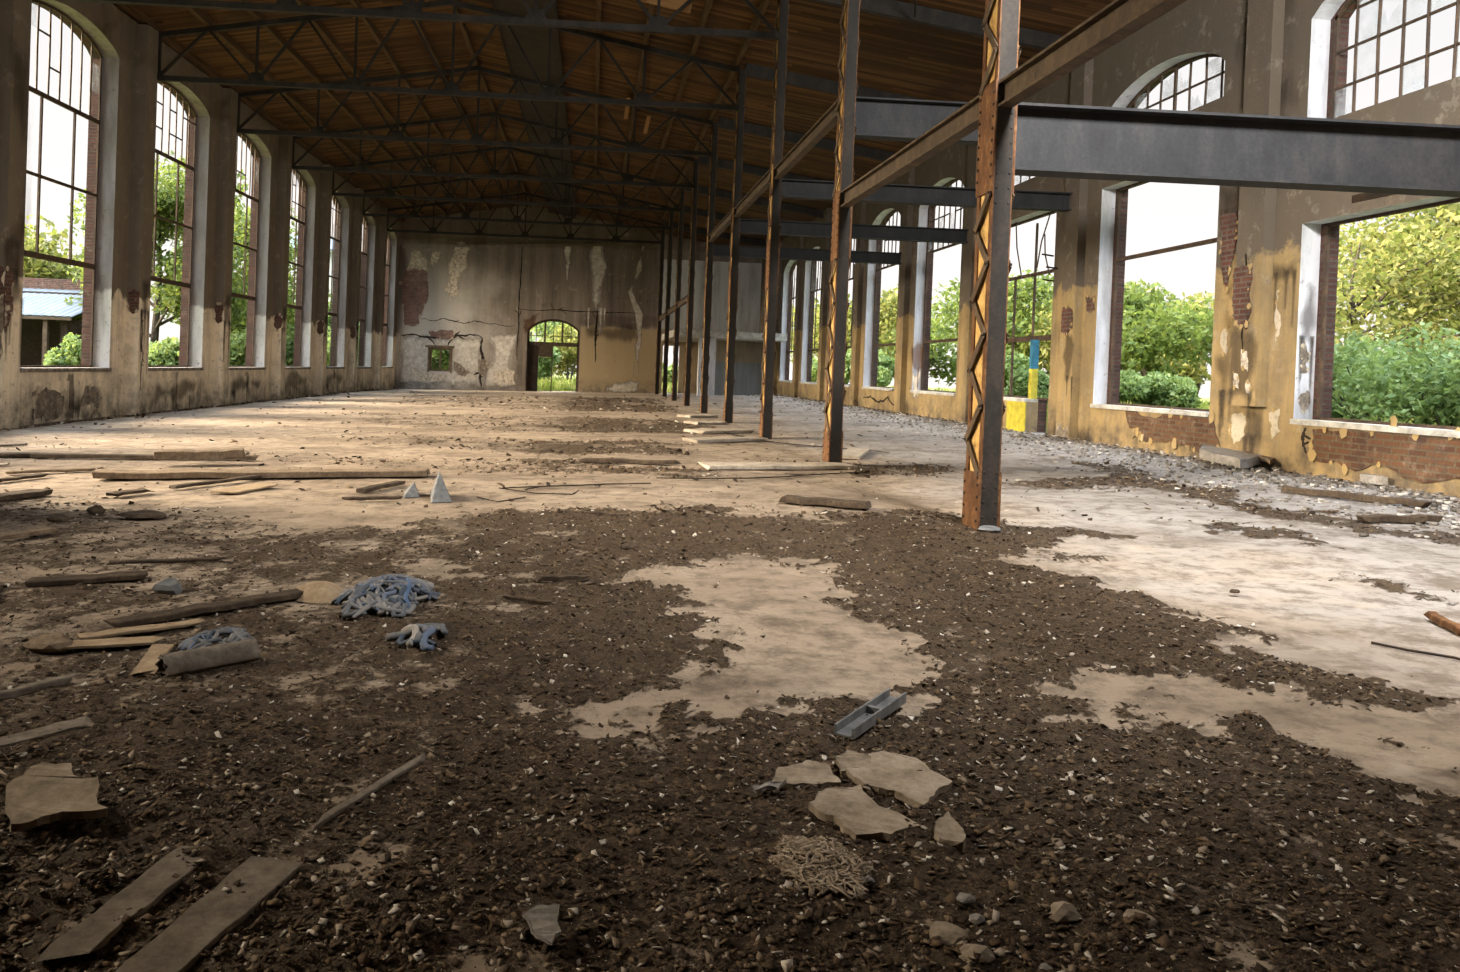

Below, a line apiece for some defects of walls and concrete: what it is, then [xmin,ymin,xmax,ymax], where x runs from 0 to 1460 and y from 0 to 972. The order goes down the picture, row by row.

spalling [0,266,14,357]
spalling [399,241,470,339]
spalling [1218,212,1253,395]
peeling [1274,287,1282,342]
spalling [410,359,515,386]
spalling [1125,408,1246,453]
peeling [1268,407,1280,439]
spalling [1298,339,1460,483]